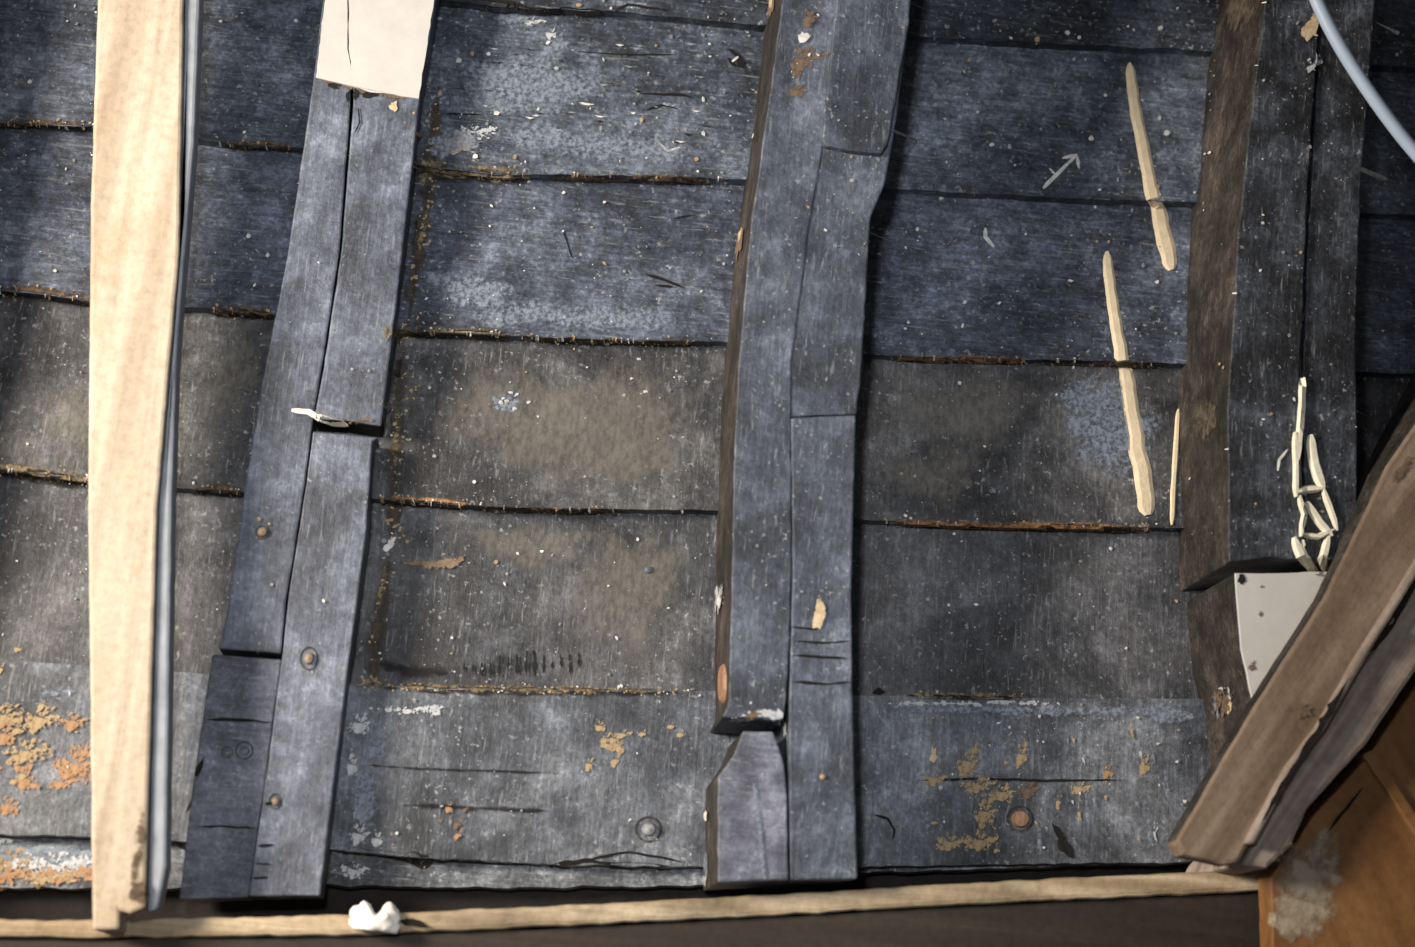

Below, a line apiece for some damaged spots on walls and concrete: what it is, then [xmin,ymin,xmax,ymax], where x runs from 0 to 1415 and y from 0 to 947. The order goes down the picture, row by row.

rust [0,115,94,134]
rust [215,136,292,154]
rust [0,282,90,306]
rust [210,303,275,321]
rust [358,88,727,696]
rust [0,458,88,488]
rust [189,481,245,497]
rust [884,517,1157,534]